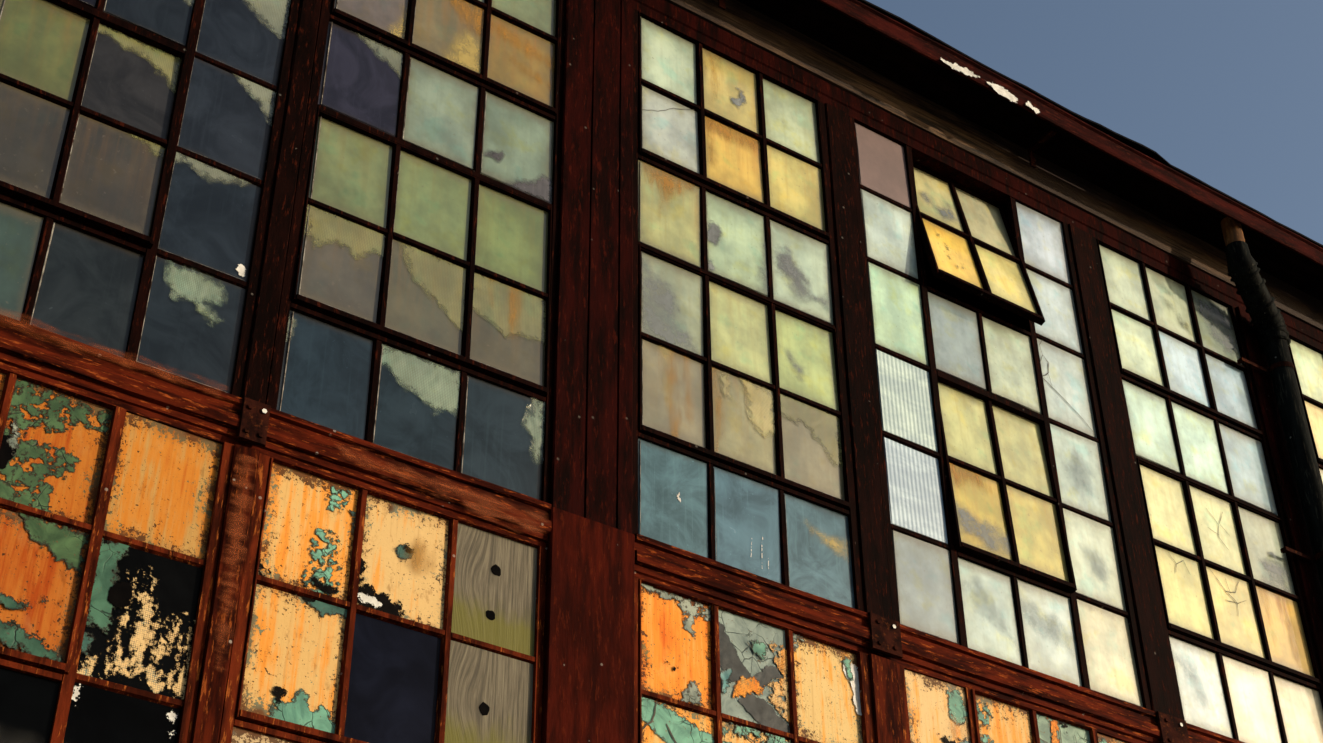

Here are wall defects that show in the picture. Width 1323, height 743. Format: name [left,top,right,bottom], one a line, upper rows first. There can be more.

peeling [0,378,196,736]
peeling [294,481,407,622]
peeling [394,543,423,569]
peeling [267,686,336,734]
peeling [641,583,805,743]
peeling [837,656,862,716]
peeling [938,688,994,743]
peeling [1040,717,1077,743]